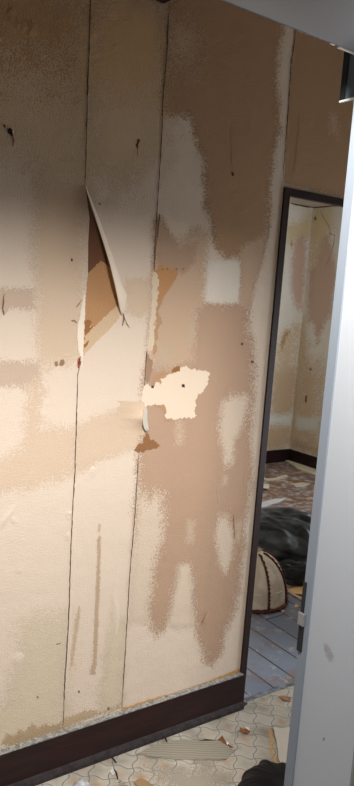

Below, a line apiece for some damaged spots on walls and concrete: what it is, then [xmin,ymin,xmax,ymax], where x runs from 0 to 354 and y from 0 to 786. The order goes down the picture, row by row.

peeling [77,186,127,366]
peeling [135,265,210,453]